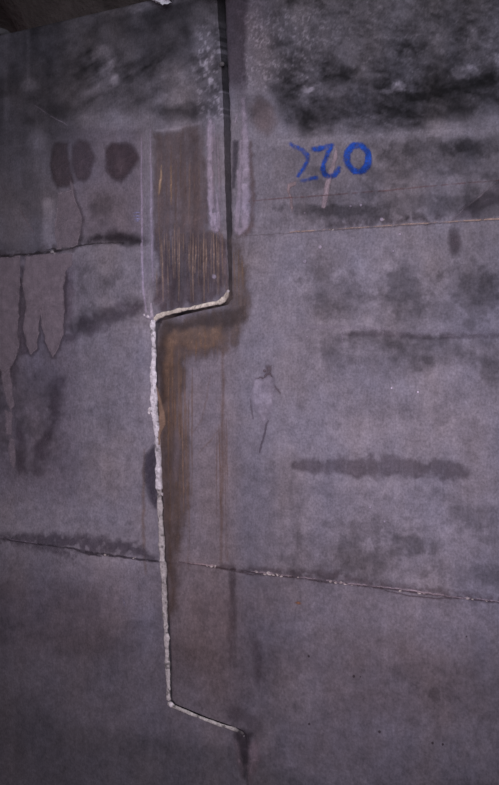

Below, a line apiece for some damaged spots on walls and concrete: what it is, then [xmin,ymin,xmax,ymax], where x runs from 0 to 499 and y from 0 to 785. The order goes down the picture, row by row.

damp [50,141,94,187]
crack [0,233,141,259]
damp [65,140,153,341]
rust [154,127,250,612]
damp [292,455,467,480]
crack [3,534,158,562]
crack [190,563,499,602]